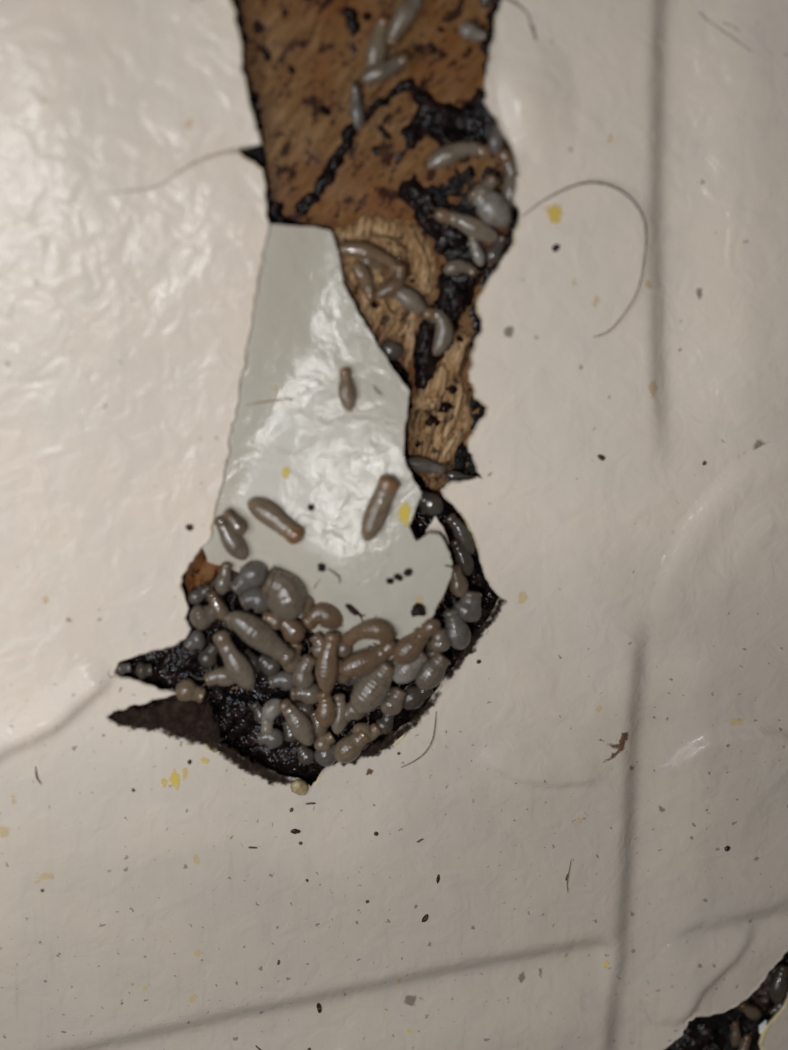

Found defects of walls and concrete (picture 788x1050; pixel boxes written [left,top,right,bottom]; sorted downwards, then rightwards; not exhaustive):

peeling [105,0,521,788]
peeling [658,948,788,1050]